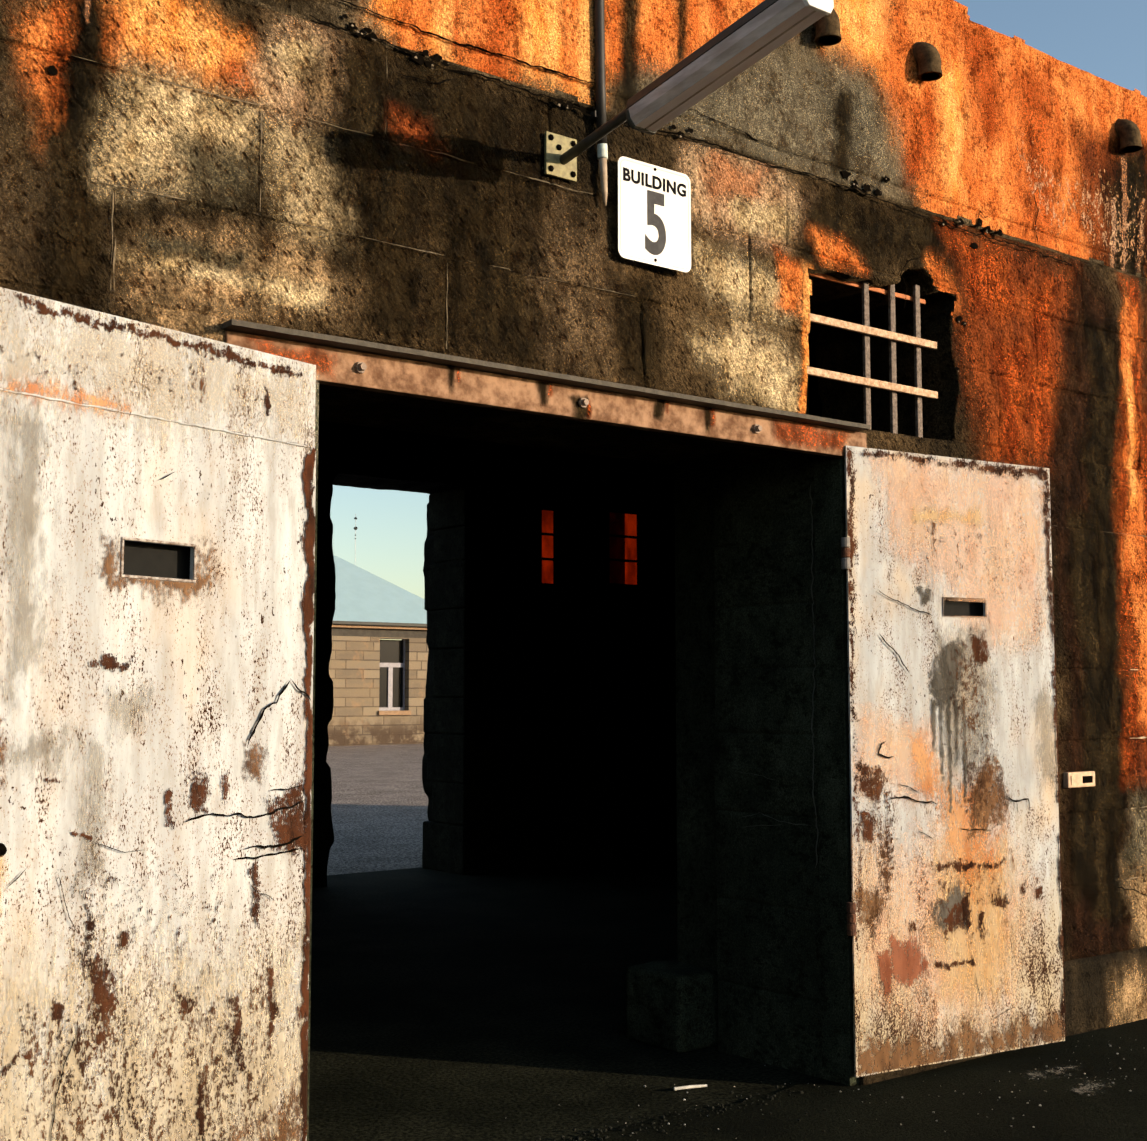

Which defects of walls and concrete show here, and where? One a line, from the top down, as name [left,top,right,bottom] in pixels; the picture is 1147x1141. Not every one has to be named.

corrosion [18,0,75,147]
corrosion [99,0,266,97]
corrosion [375,0,764,109]
damp [1101,146,1147,278]
corrosion [10,291,329,416]
corrosion [777,0,1147,996]
damp [1049,277,1147,960]
crack [247,678,311,748]
corrosion [0,447,316,1141]
crack [186,800,304,822]
corrosion [858,828,1066,1076]